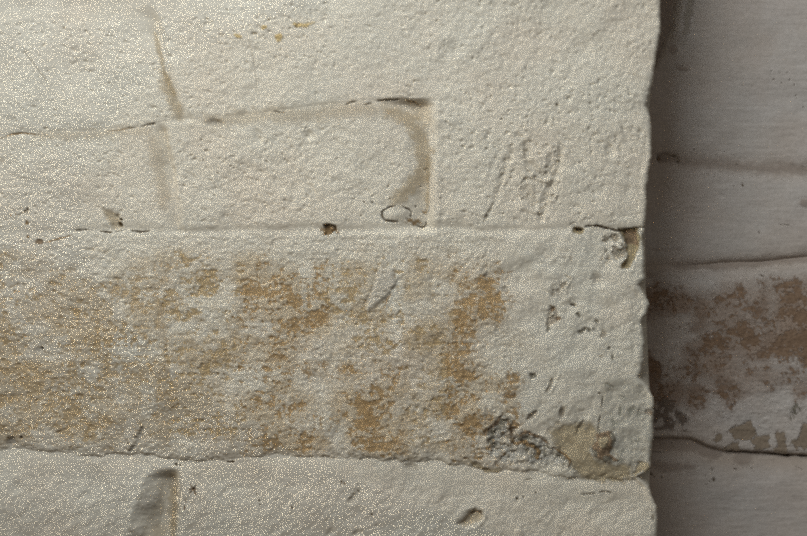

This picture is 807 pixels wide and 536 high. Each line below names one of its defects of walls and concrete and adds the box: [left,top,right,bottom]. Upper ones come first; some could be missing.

spalling [602,228,641,268]
peeling [0,253,537,473]
peeling [646,277,807,418]
flaking render [551,409,650,482]
peeling [713,420,807,454]